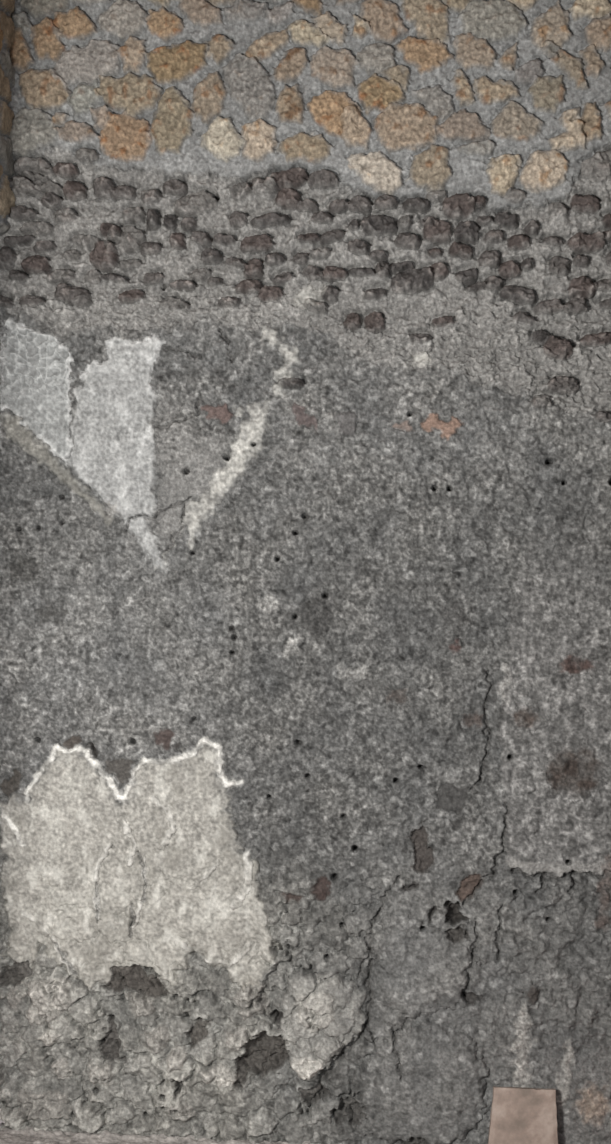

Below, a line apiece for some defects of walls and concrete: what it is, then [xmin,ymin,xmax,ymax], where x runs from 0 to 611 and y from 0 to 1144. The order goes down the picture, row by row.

spalling [0,147,611,572]
crack [470,671,493,791]
crack [461,802,605,1003]
crack [316,875,412,1086]
spalling [97,1014,127,1063]
spalling [185,1017,213,1050]
spalling [231,1011,290,1090]
spalling [161,1079,184,1102]
spalling [298,1083,368,1128]